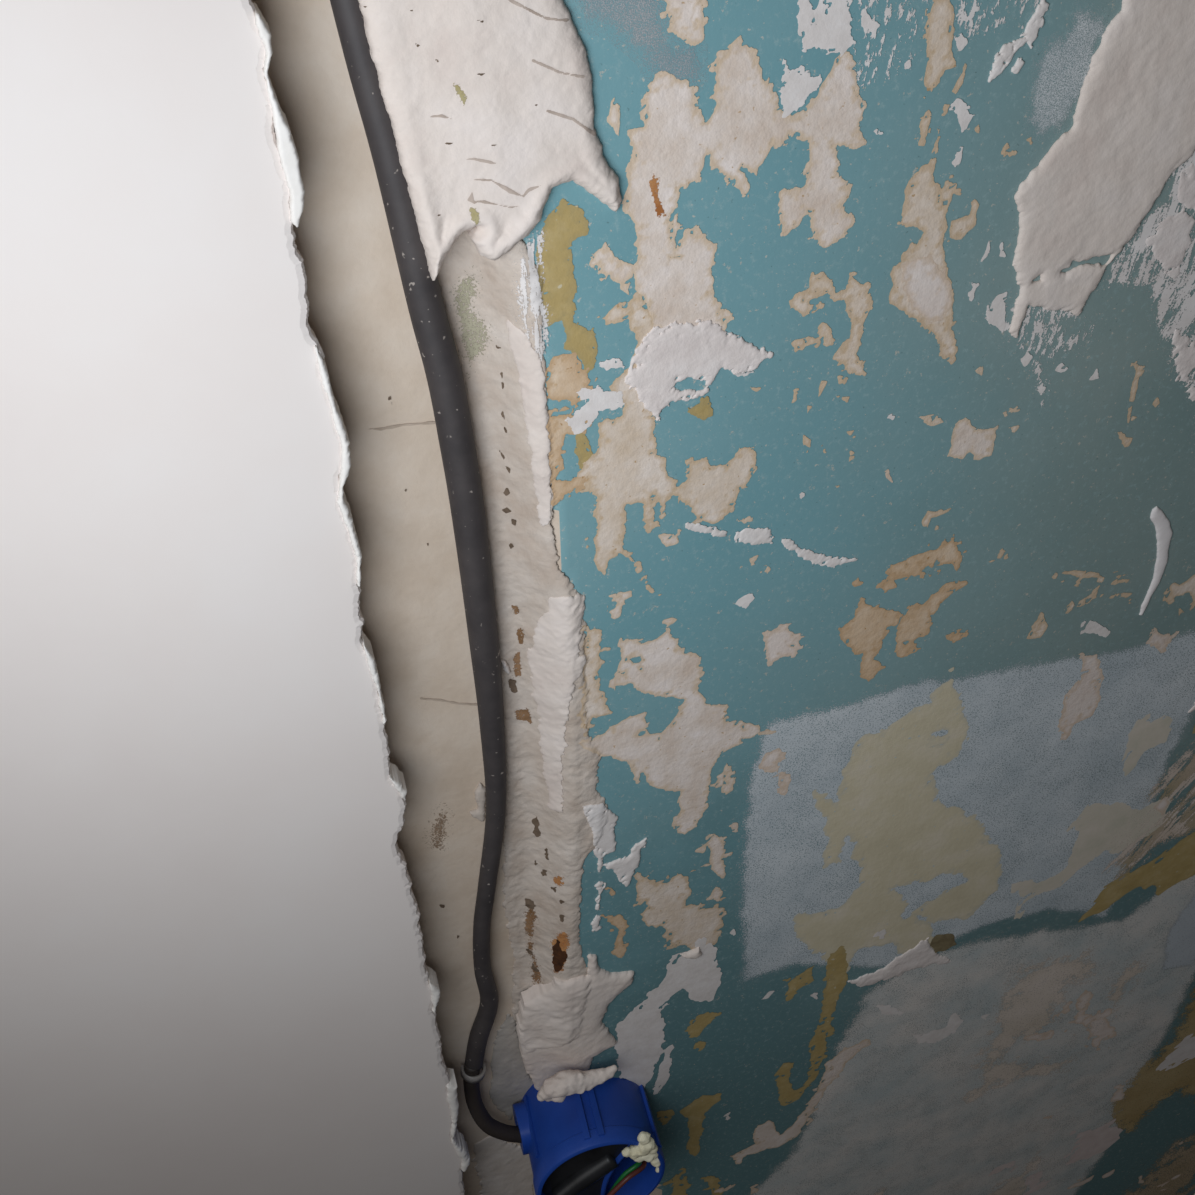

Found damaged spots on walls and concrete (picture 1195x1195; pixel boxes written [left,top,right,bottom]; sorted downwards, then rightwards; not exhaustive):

peeling [889,0,979,365]
peeling [919,406,1020,460]
peeling [1118,361,1145,447]
peeling [838,508,968,682]
peeling [1052,570,1132,614]
peeling [1163,574,1195,615]
rust [511,605,524,677]
rust [515,709,532,724]
rust [524,908,570,985]
peeling [730,667,1195,1165]
peeling [657,1093,722,1156]
flaking render [471,1136,535,1195]